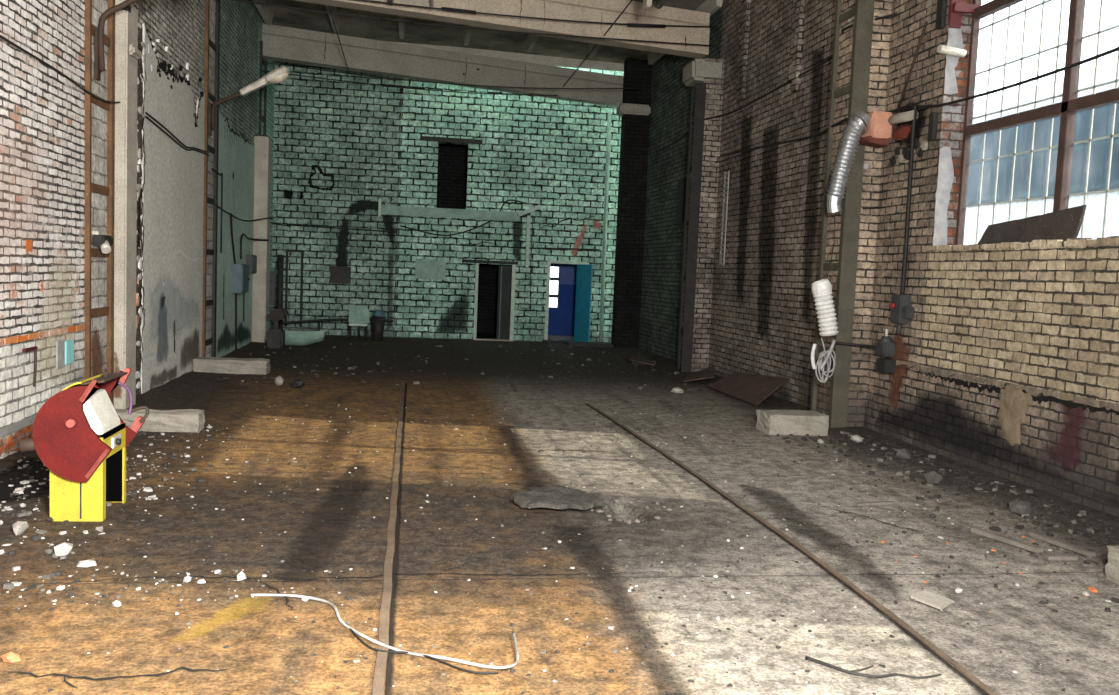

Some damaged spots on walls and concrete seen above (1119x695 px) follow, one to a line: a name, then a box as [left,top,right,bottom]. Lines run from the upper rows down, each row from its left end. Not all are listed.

spalling [136,27,204,396]
water stain [150,282,199,389]
water stain [880,397,1036,470]